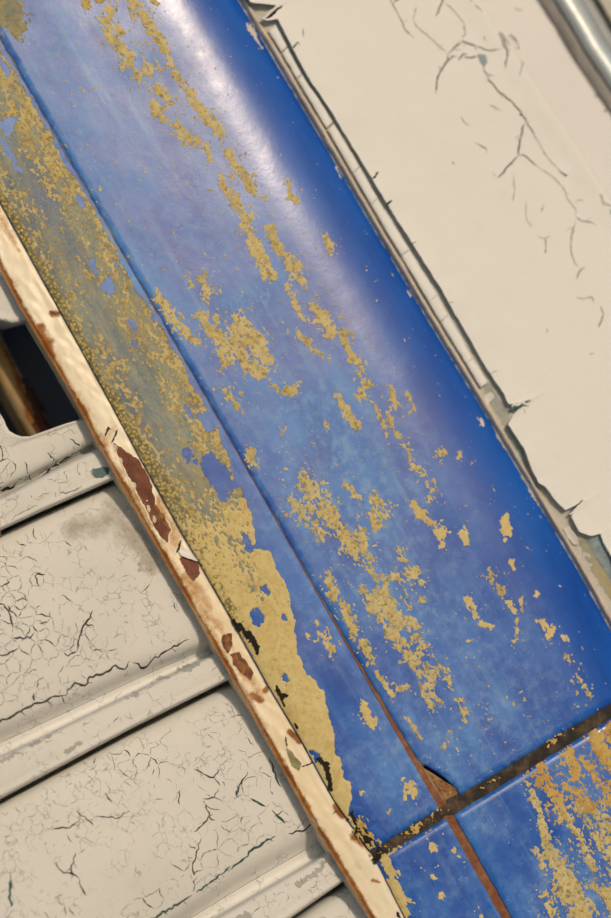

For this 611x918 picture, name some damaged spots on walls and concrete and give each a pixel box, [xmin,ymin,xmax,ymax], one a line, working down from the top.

rust [0,263,375,918]
peeling [0,0,476,918]
flaking render [238,0,611,631]
crack [390,0,604,328]
peeling [476,559,540,649]
peeling [535,619,570,642]
peeling [563,653,595,708]
crack [252,863,322,917]